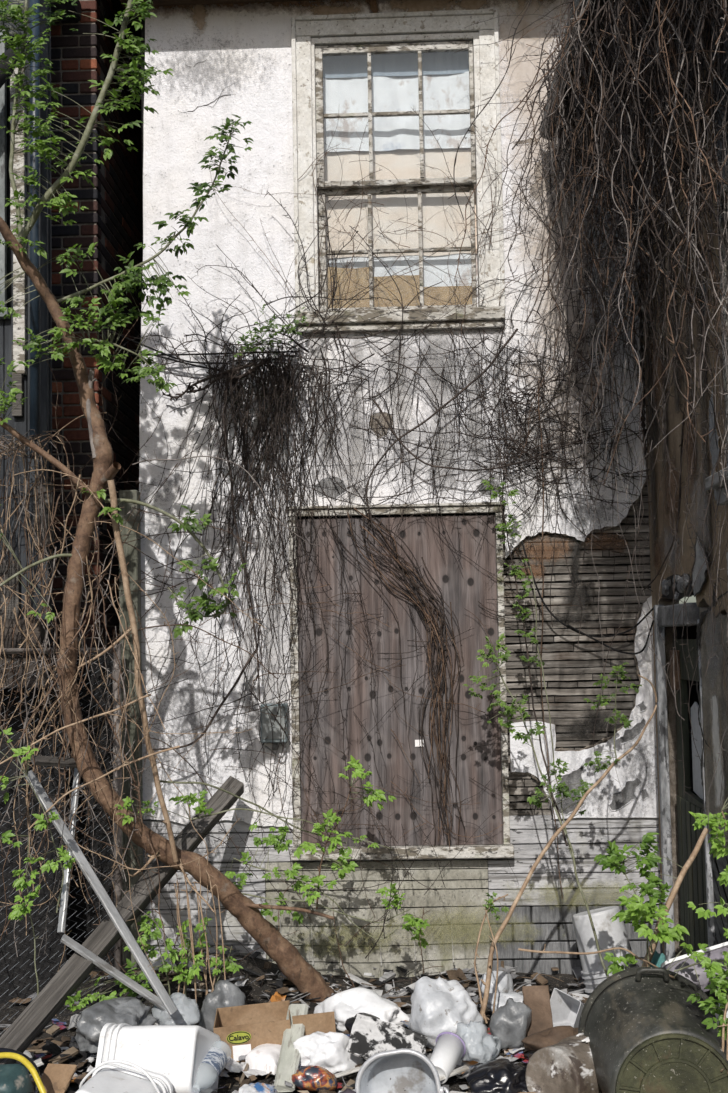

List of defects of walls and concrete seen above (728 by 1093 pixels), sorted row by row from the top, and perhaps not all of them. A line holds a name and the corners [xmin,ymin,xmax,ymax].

flaking render [368,411,395,439]
flaking render [313,477,348,501]
flaking render [476,480,503,496]
flaking render [503,478,709,818]